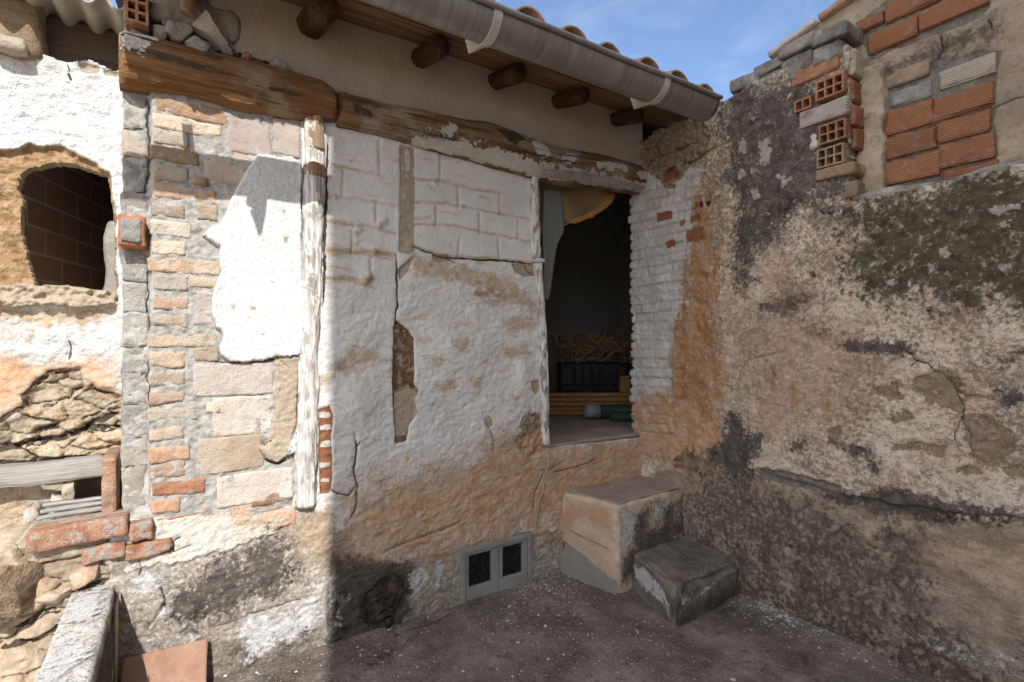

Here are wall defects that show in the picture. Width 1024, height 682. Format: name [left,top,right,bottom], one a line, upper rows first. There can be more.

spalling [0,145,112,286]
spalling [111,202,119,301]
crack [395,247,534,320]
peeling [398,119,711,279]
spalling [31,370,83,411]
peeling [392,321,419,444]
water stain [130,73,1024,680]
crack [904,351,977,457]